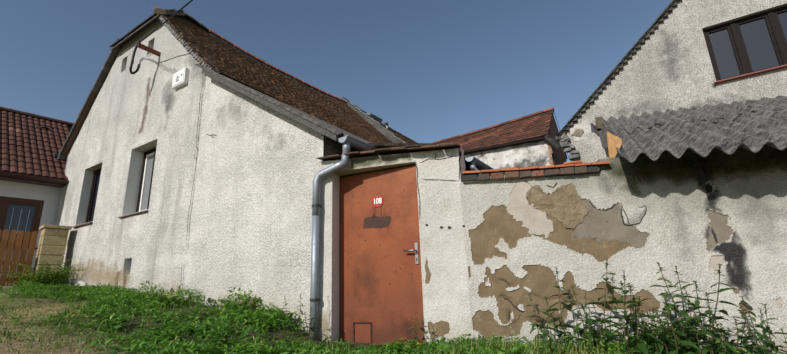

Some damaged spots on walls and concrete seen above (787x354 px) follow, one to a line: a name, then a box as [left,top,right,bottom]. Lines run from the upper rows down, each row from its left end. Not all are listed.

spalling [428,321,450,339]
spalling [462,179,660,339]
water stain [690,161,753,315]